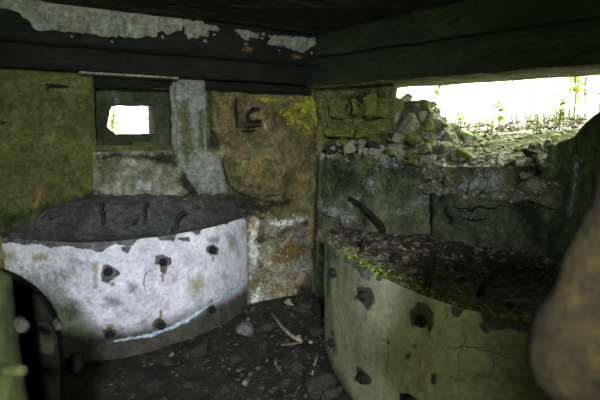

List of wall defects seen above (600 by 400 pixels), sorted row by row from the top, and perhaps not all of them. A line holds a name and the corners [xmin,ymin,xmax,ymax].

peeling [0,0,220,43]
peeling [234,29,316,54]
crack [222,156,284,203]
spalling [456,170,506,195]
crack [451,205,505,222]
spalling [2,238,138,253]
spalling [158,230,201,242]